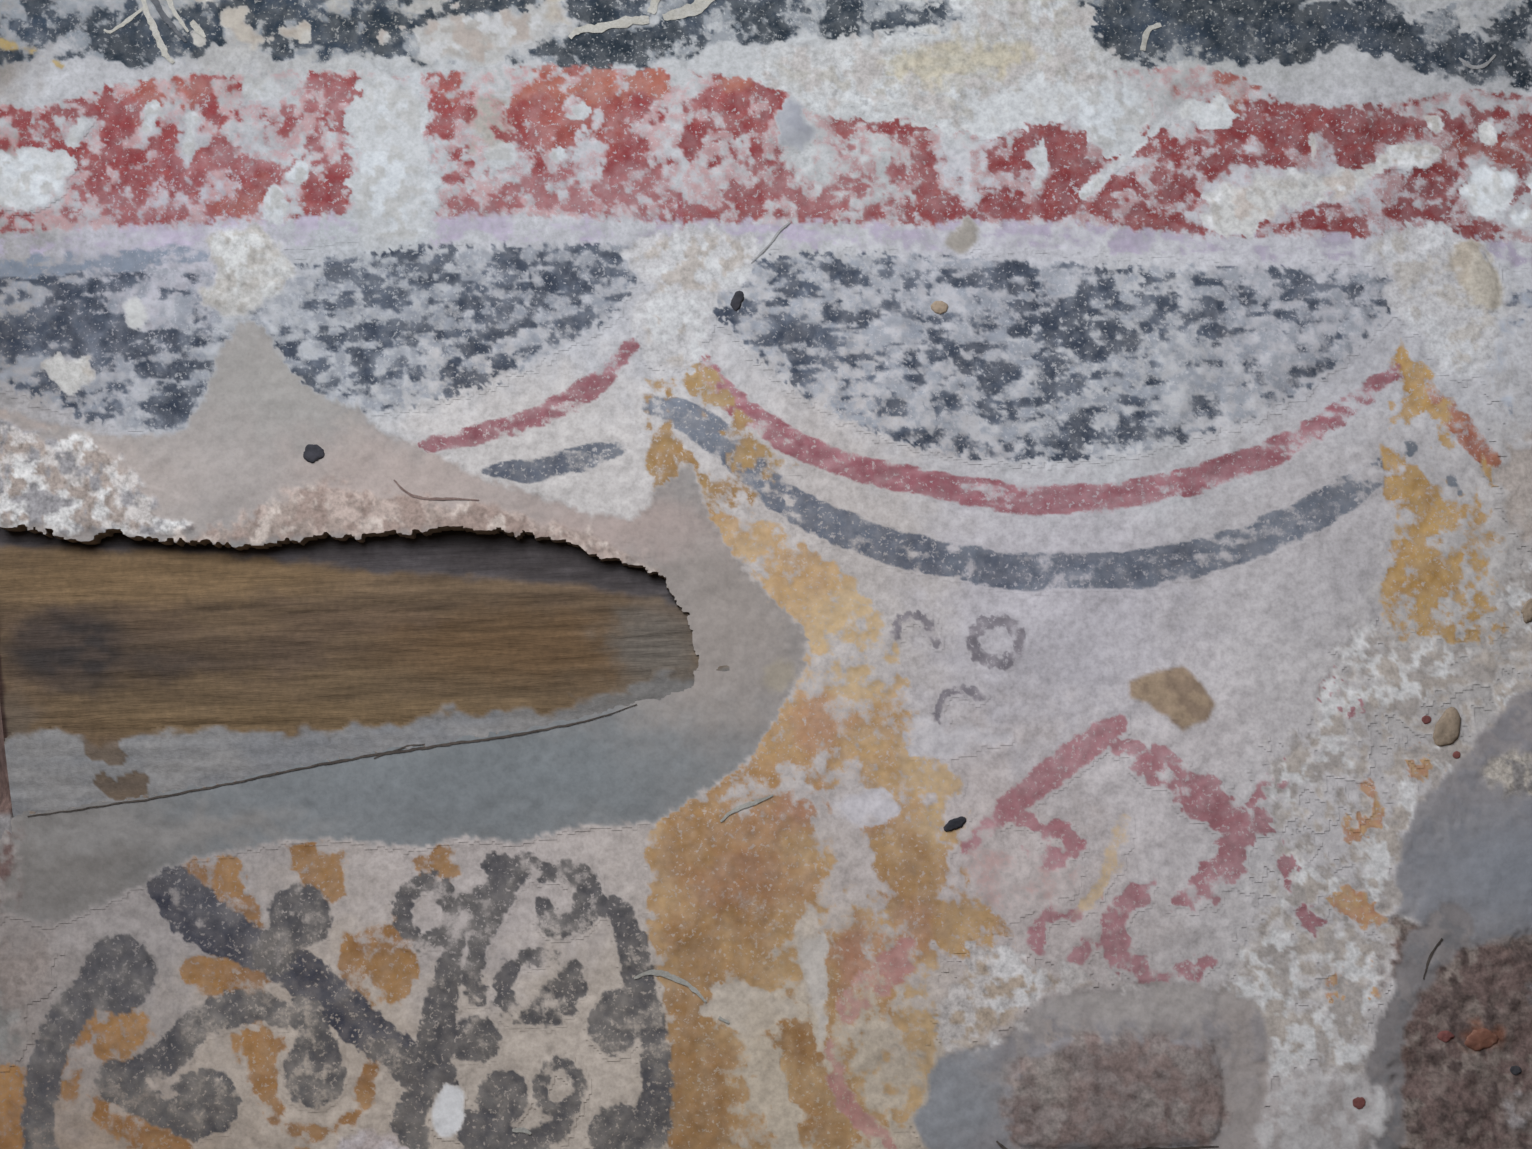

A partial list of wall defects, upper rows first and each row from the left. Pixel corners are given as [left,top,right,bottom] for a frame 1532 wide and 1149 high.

spalling [0,413,664,575]
spalling [1197,112,1532,1149]